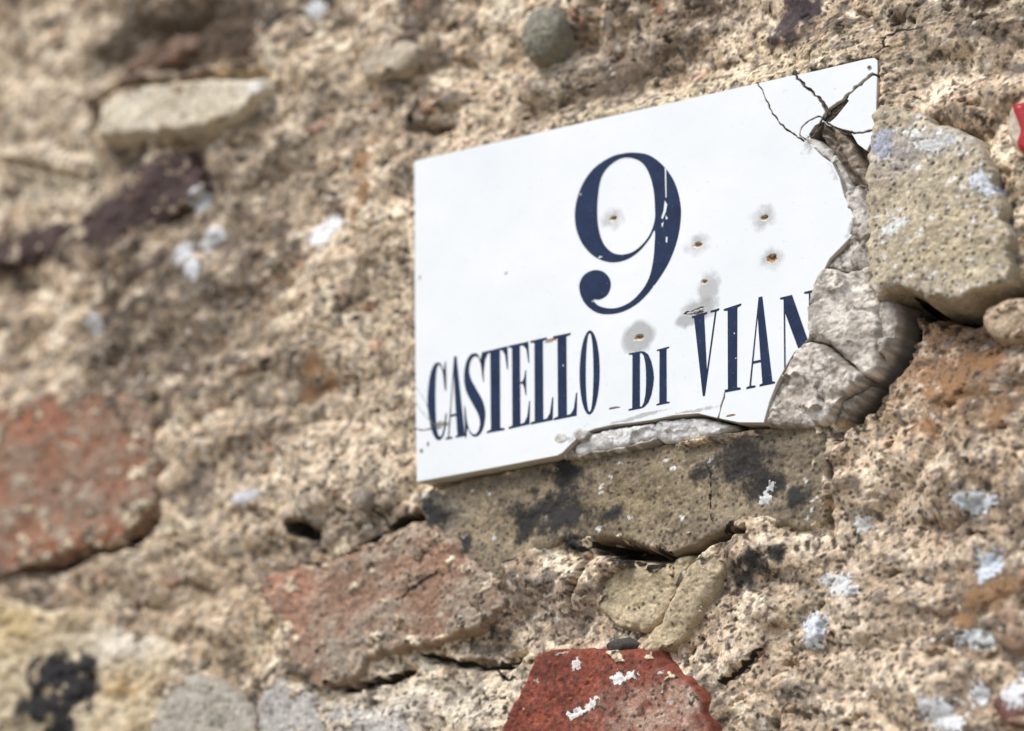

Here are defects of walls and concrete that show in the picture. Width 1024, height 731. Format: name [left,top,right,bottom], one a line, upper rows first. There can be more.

crack [756,27,922,142]
leakage [422,497,452,529]
leakage [456,533,472,555]
leakage [508,459,622,555]